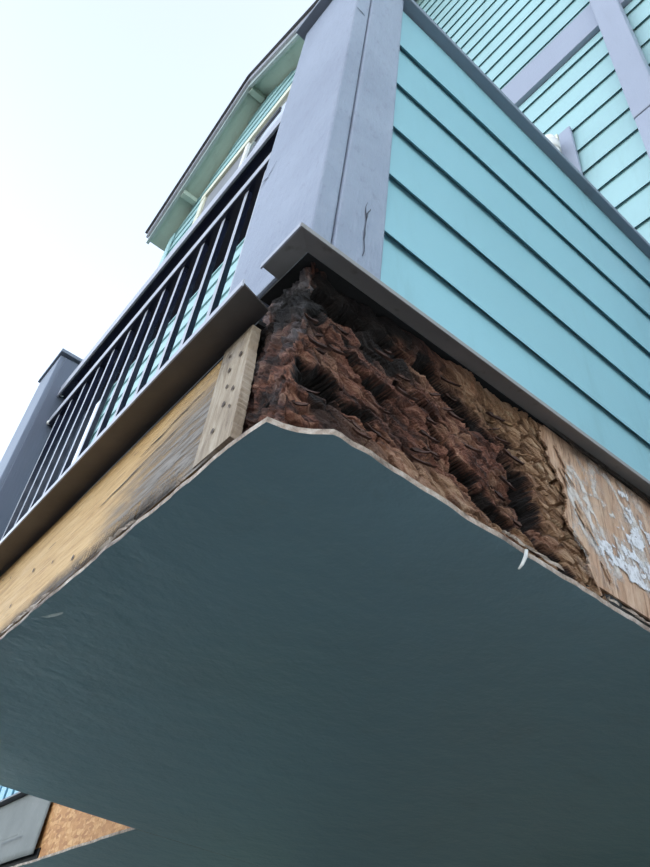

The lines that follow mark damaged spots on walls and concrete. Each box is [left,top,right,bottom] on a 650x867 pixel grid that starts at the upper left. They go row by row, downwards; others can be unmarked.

crack [362,202,371,256]
leakage [557,432,650,592]